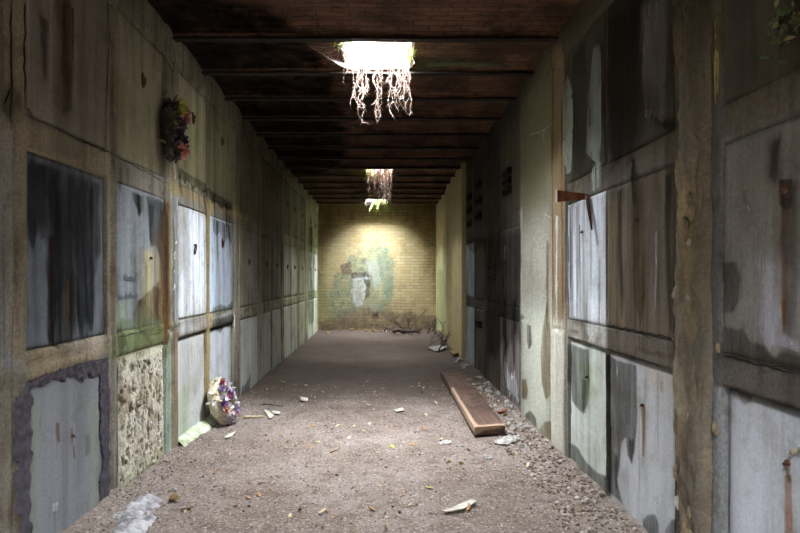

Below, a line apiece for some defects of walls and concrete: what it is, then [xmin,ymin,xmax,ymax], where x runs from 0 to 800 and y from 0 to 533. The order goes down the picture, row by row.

crack [4,1,34,119]
water stain [27,158,100,347]
peeling [330,247,393,316]
spalling [117,345,164,487]
water stain [606,355,627,453]
crack [723,355,799,374]